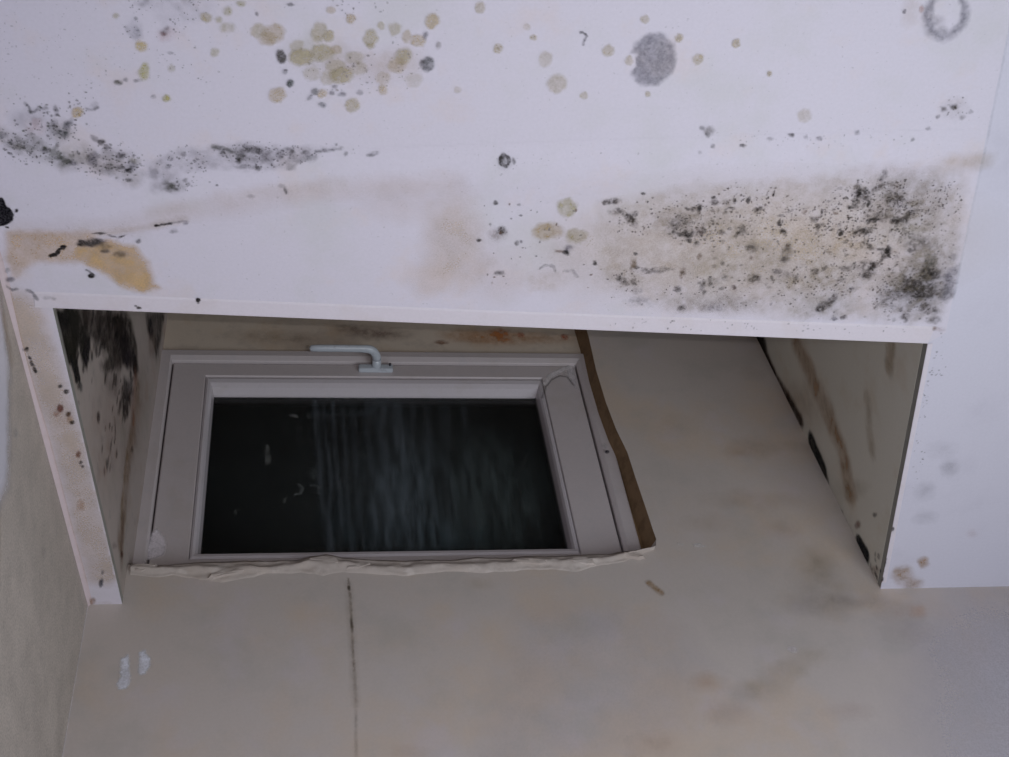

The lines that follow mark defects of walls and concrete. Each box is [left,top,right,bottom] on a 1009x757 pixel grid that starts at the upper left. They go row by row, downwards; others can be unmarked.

mould [277,33,333,64]
damp [214,147,294,169]
damp [39,232,153,291]
mould [603,179,952,321]
damp [137,307,164,355]
damp [57,309,138,443]